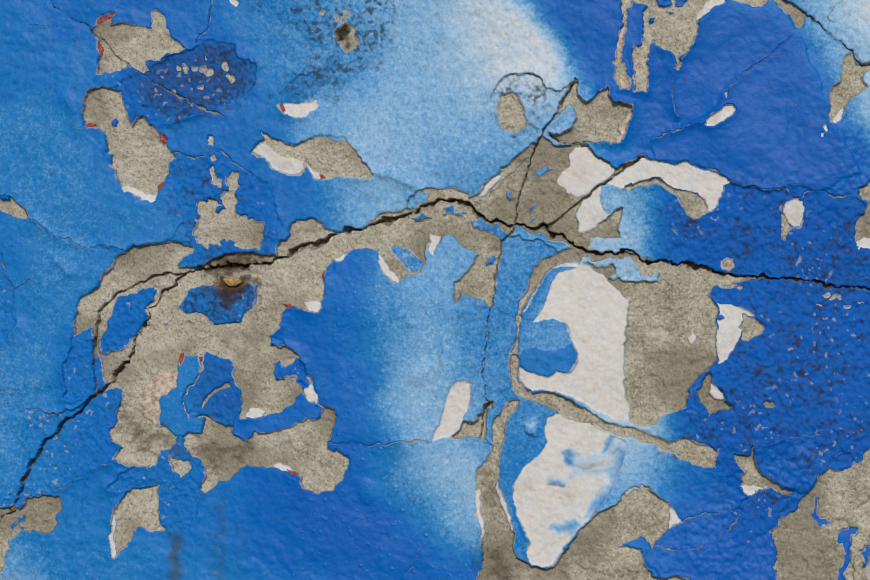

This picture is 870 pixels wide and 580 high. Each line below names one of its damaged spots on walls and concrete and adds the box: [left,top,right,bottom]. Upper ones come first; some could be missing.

crack [29,0,227,118]
peeling [93,11,185,74]
peeling [614,0,808,92]
crack [726,0,870,96]
crack [174,149,257,179]
crack [251,50,870,438]
peeling [780,199,806,241]
peeling [855,181,870,250]
peeling [74,80,764,580]
crack [0,264,229,522]
crack [654,491,766,552]
spalling [734,446,870,580]